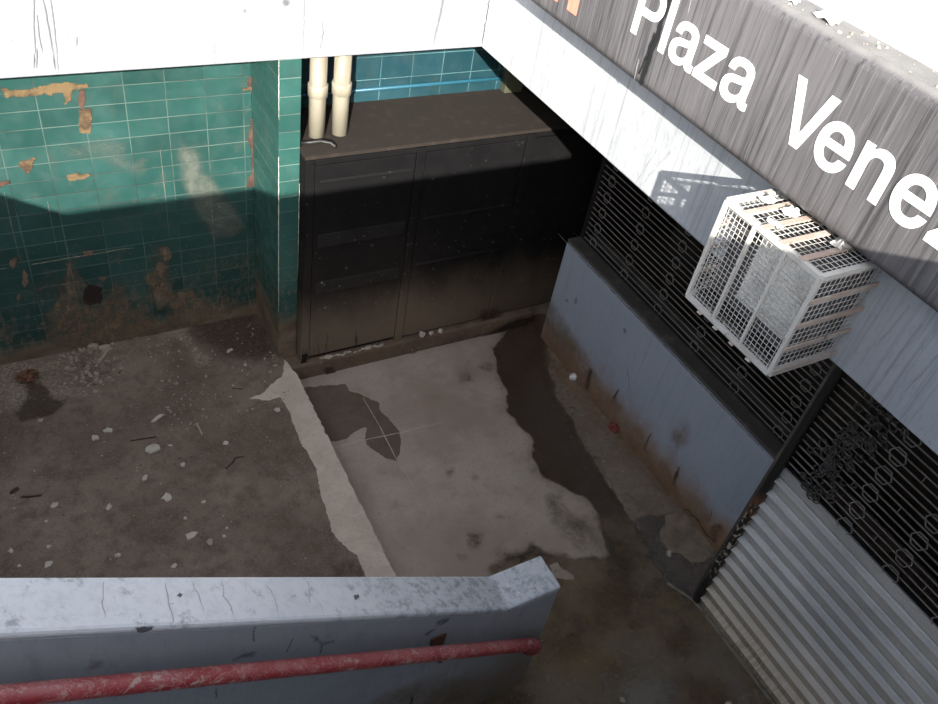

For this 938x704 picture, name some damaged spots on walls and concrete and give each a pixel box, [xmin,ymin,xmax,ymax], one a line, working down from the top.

damp [634,0,671,85]
spalling [1,82,92,134]
spalling [18,157,35,174]
spalling [67,173,90,181]
damp [146,246,270,368]
damp [484,314,712,597]